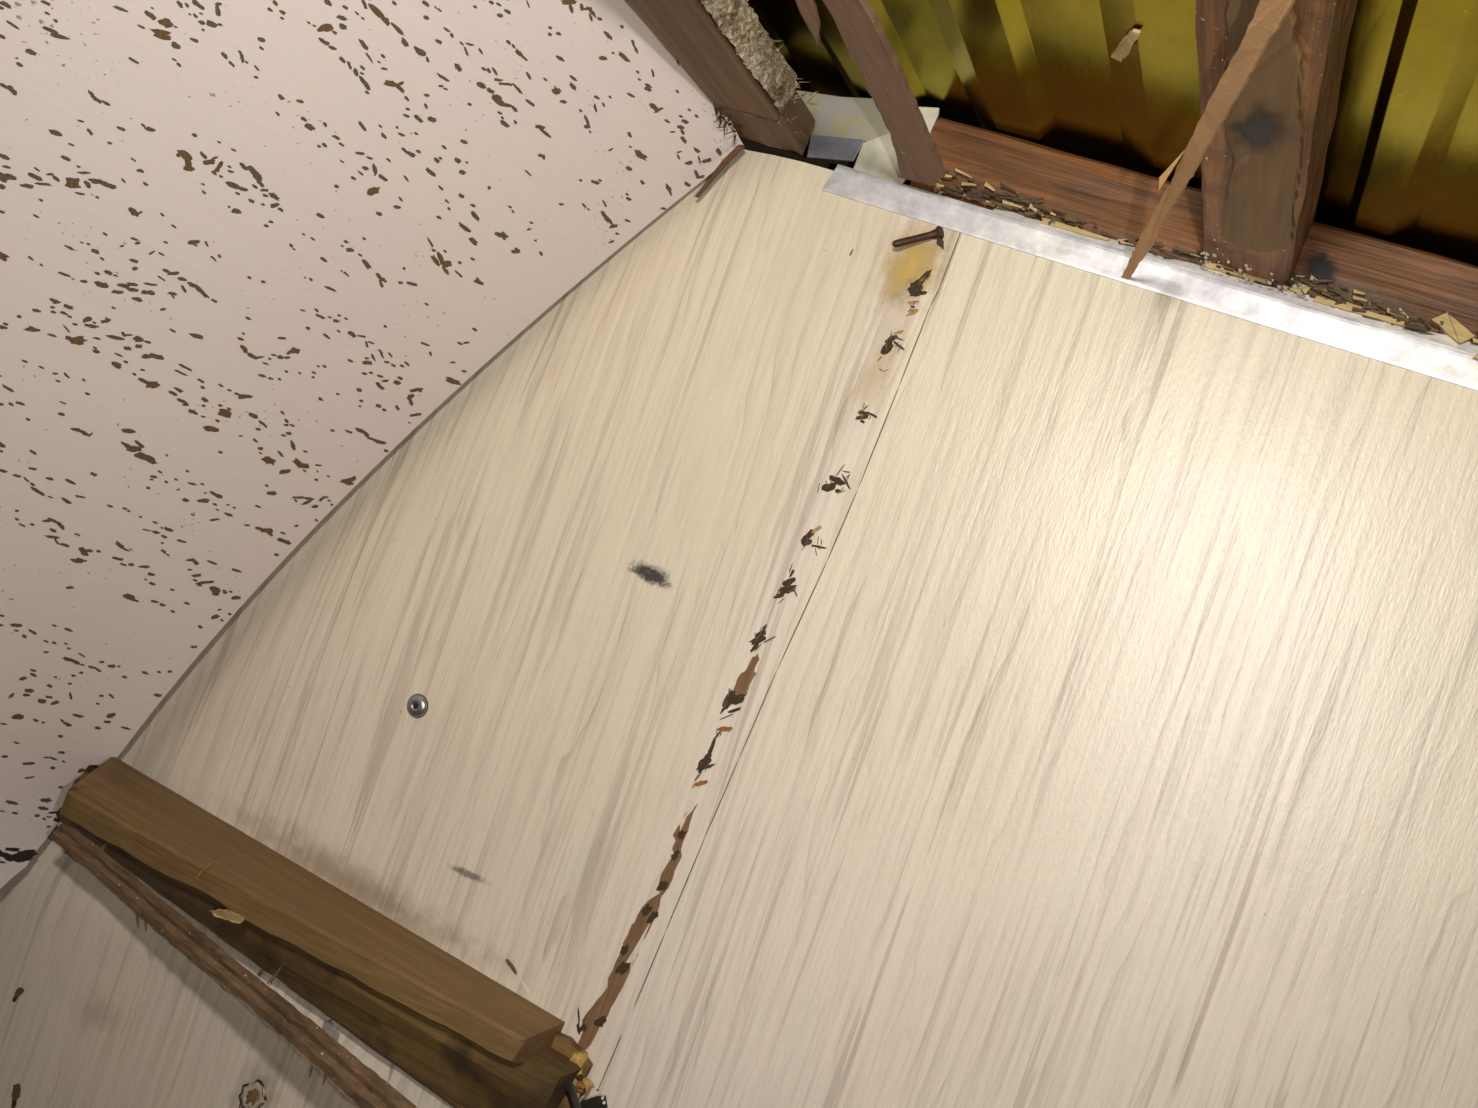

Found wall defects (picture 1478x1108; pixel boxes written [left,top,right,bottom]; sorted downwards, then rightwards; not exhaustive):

crack [598,234,960,1089]
water stain [888,242,937,299]